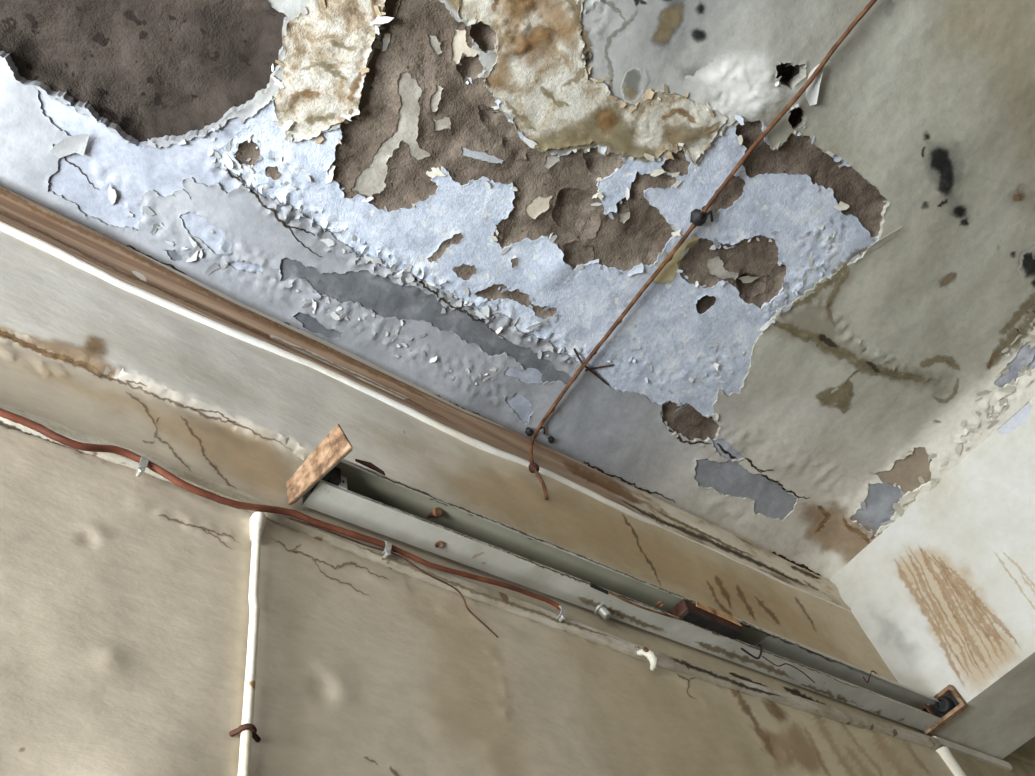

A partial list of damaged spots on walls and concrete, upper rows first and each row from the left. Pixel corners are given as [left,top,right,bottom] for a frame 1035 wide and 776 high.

leakage [921,134,968,225]
peeling [0,0,903,520]
crack [39,349,267,486]
crack [162,515,234,548]
crack [277,541,385,594]
crack [624,517,660,582]
leakage [899,550,1016,676]